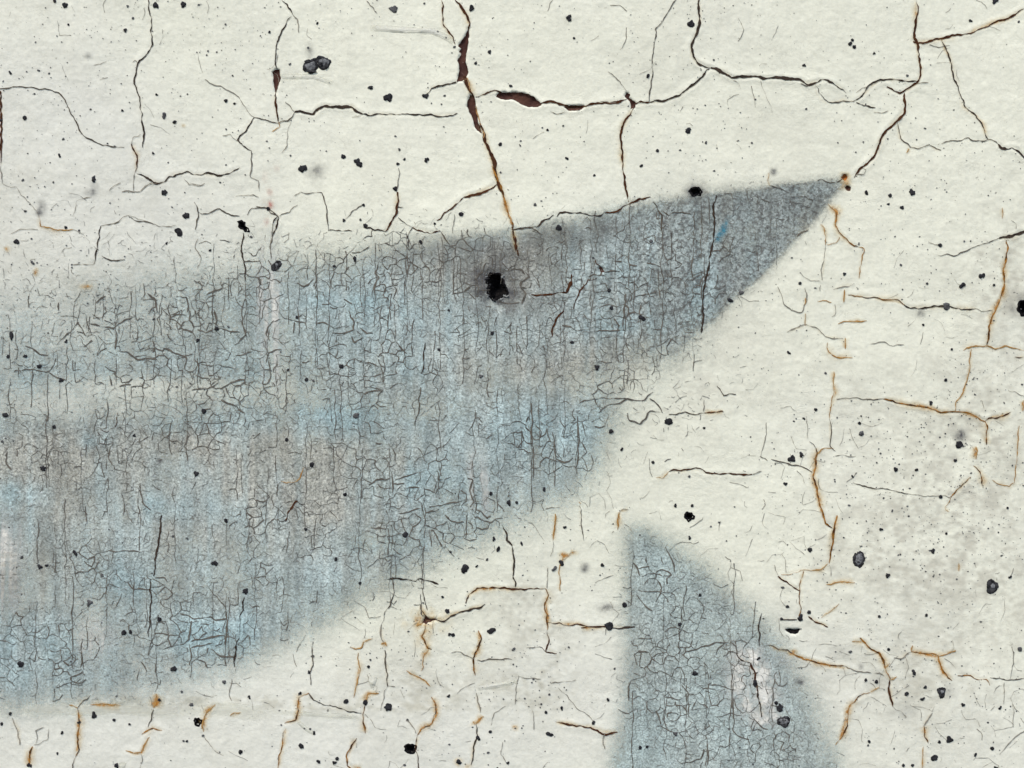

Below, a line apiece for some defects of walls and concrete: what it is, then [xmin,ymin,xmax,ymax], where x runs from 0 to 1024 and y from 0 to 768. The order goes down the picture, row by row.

crack [441,0,470,43]
peeling [457,29,469,82]
crack [0,0,239,192]
crack [198,1,458,197]
crack [427,75,502,98]
peeling [467,95,482,133]
peeling [496,92,541,107]
crack [541,99,627,114]
crack [66,211,174,284]
crack [644,452,761,488]
crack [610,536,956,768]
crack [452,630,537,764]